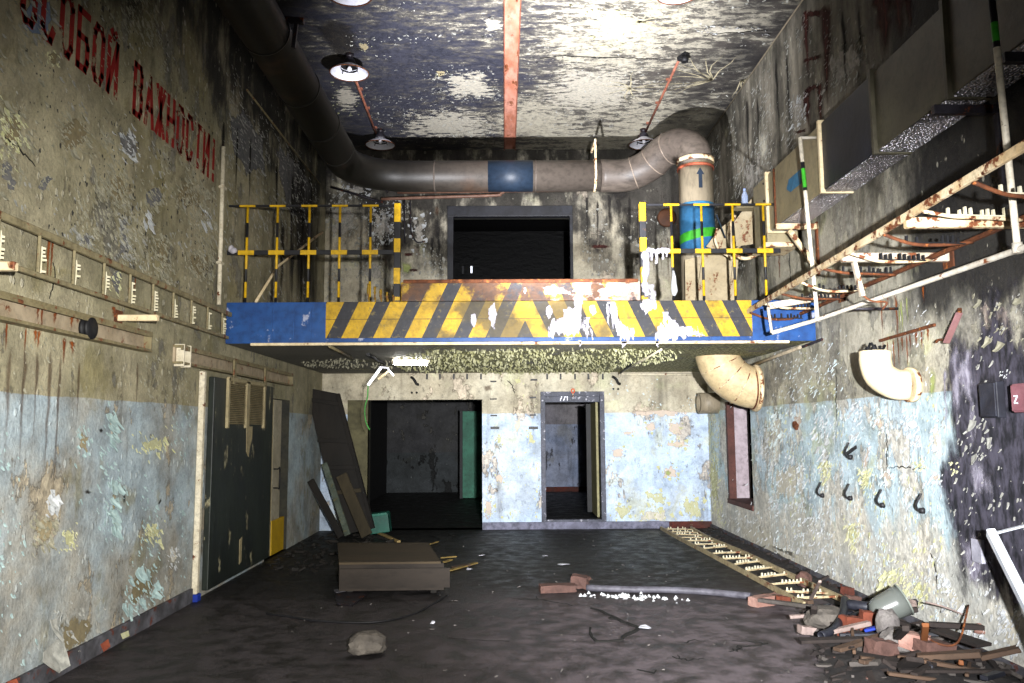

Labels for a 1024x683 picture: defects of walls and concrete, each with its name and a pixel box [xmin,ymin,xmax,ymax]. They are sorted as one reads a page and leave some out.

water stain [596,3,686,43]
water stain [595,52,742,99]
corrosion [879,295,936,367]
peeling [74,327,193,639]
peeling [481,430,539,519]
peeling [608,305,1022,660]
water stain [930,290,1024,611]
peeling [0,490,78,633]
peeling [21,595,110,673]